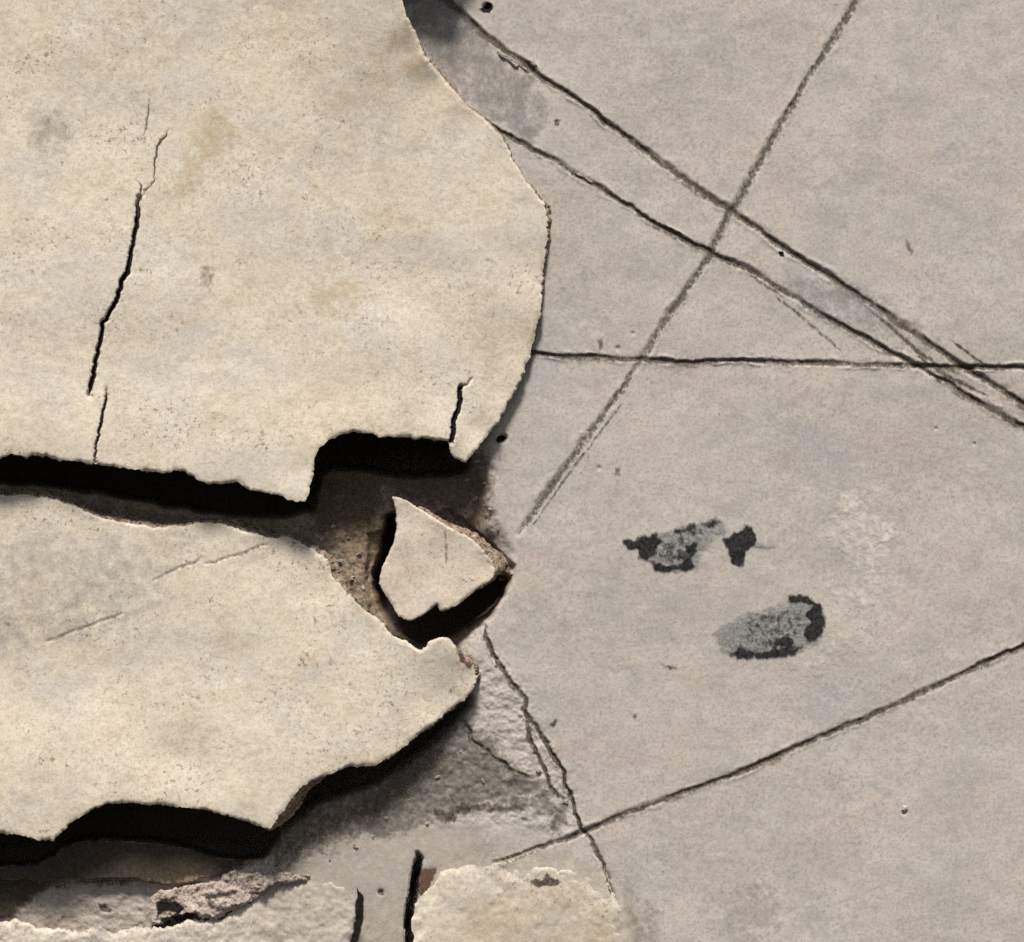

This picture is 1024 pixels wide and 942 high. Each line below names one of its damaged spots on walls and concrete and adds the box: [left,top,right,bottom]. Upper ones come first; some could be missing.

spalling [419,41,552,361]
crack [89,109,167,463]
crack [449,382,469,442]
spalling [0,488,360,605]
leakage [623,518,773,572]
leakage [714,487,898,672]
spalling [453,643,481,683]
crack [468,625,613,893]
spalling [265,775,327,831]
spalling [142,869,310,928]
spalling [531,873,559,887]